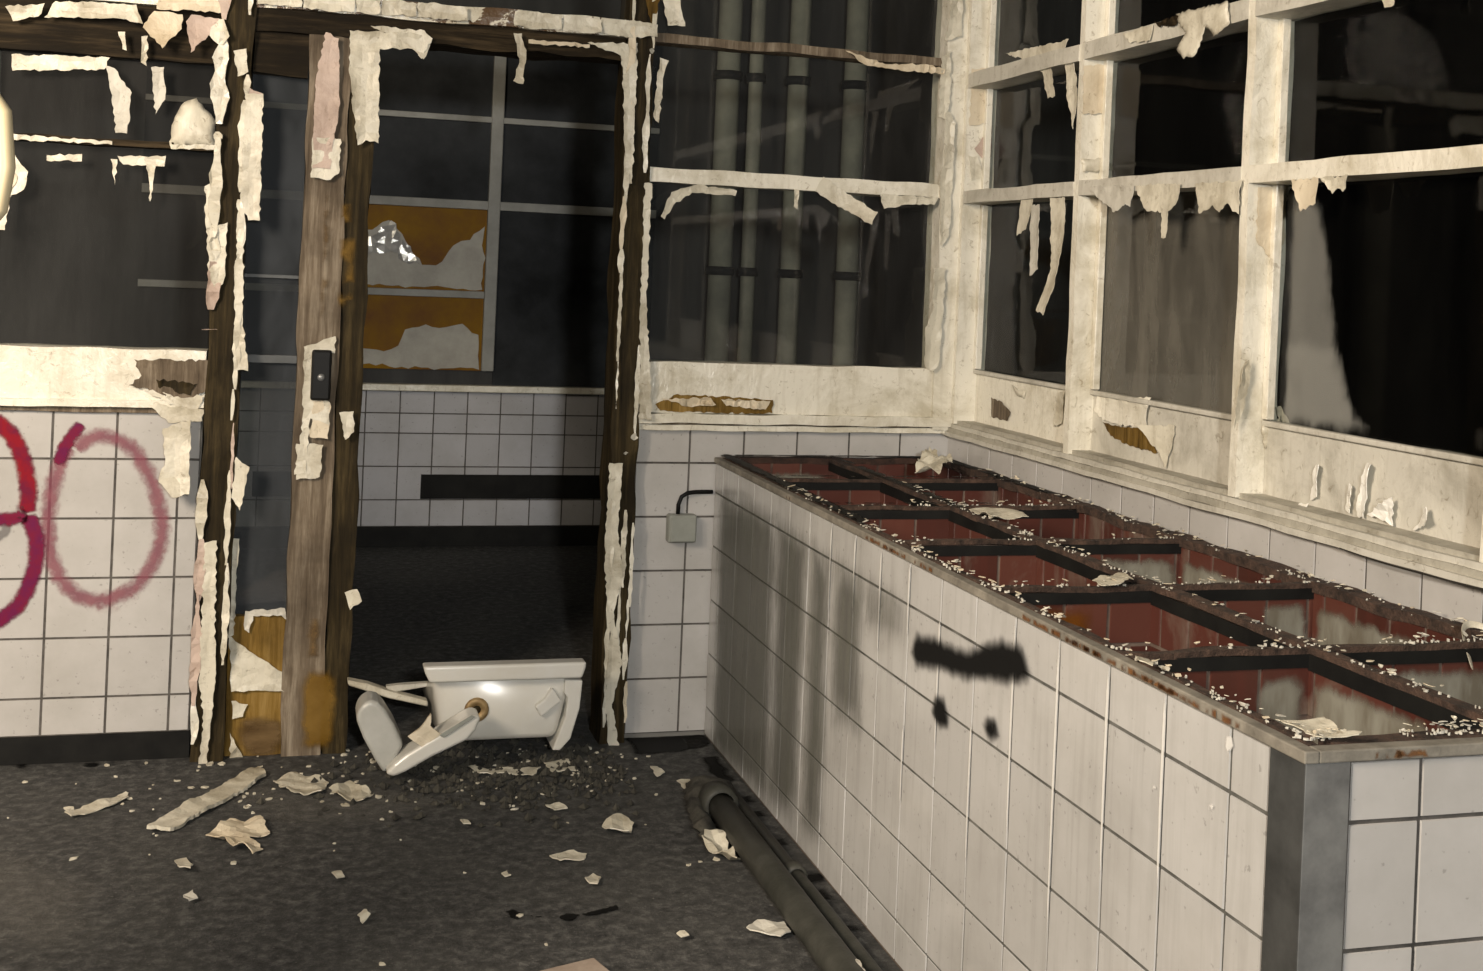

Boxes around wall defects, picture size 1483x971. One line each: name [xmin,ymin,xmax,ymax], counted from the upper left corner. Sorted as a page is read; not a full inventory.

peeling [1006,39,1104,128]
peeling [1017,197,1065,315]
peeling [1081,158,1348,258]
peeling [0,0,485,764]
peeling [513,0,774,746]
water stain [716,503,856,812]
peeling [783,480,1068,622]
peeling [902,463,1450,698]
water stain [1006,679,1014,829]
water stain [1047,655,1059,919]
water stain [1100,678,1109,867]
water stain [1153,704,1166,878]